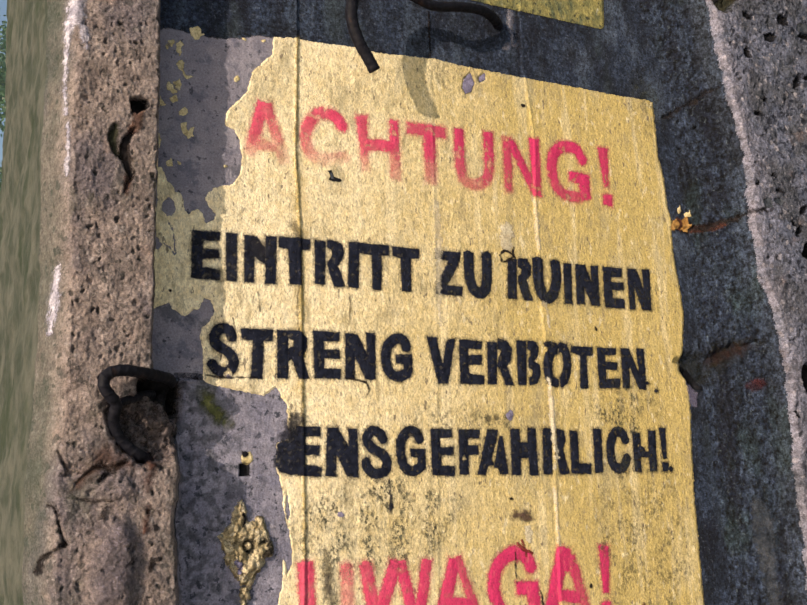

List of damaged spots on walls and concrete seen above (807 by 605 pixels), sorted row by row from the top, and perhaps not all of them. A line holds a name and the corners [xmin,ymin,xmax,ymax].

spalling [712,0,735,13]
peeling [155,26,273,255]
rust [671,206,692,232]
peeling [120,289,293,605]